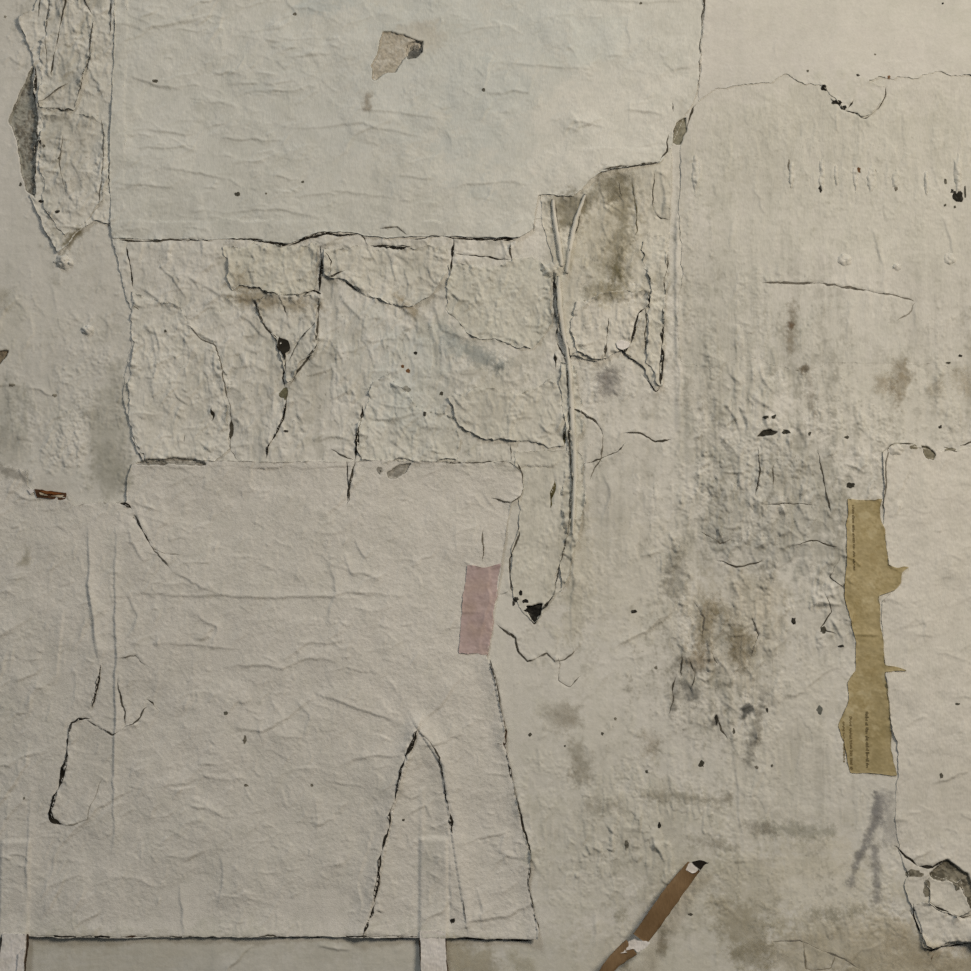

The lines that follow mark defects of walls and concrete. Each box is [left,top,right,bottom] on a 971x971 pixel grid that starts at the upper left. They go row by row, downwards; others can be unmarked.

peeling [9,0,127,252]
crack [124,238,208,309]
crack [121,502,178,567]
crack [189,326,236,458]
crack [332,406,364,503]
crack [233,226,513,455]
crack [447,446,524,592]
crack [543,254,670,609]
crack [498,625,580,687]
crack [29,932,323,940]
crack [451,800,539,941]
peeling [905,859,971,948]